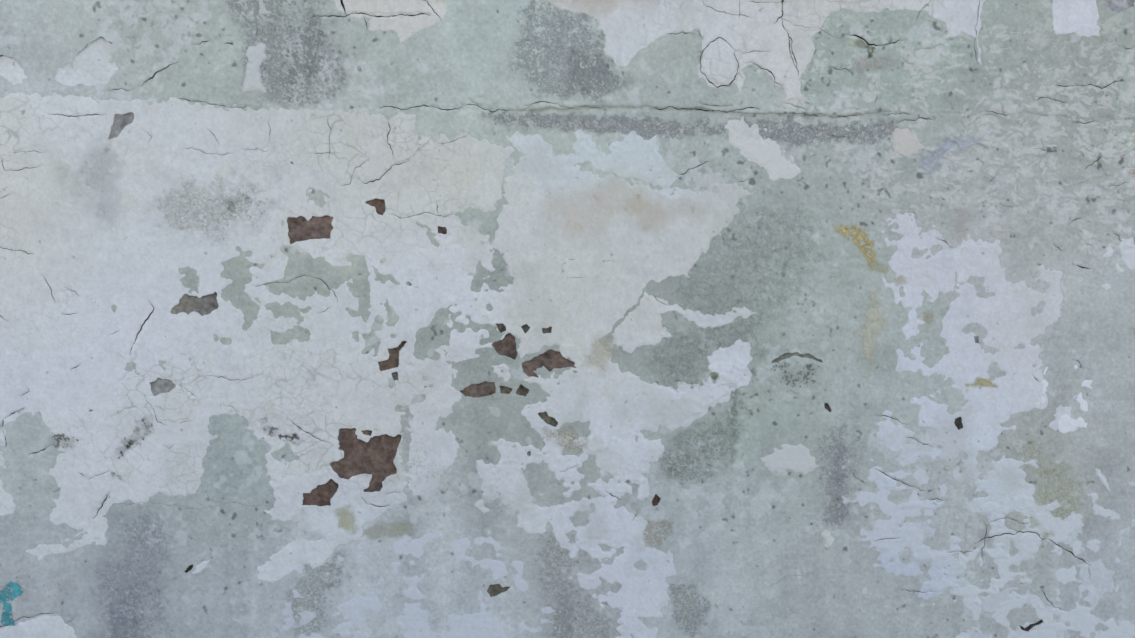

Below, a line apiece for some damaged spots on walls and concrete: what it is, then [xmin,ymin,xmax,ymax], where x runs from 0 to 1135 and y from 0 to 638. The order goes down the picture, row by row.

crack [306,0,441,26]
peeling [1052,0,1135,37]
peeling [543,0,986,110]
crack [341,101,601,186]
peeling [725,116,801,181]
crack [256,275,338,312]
crack [113,301,154,354]
peeling [0,31,757,638]
peeling [841,213,1135,638]